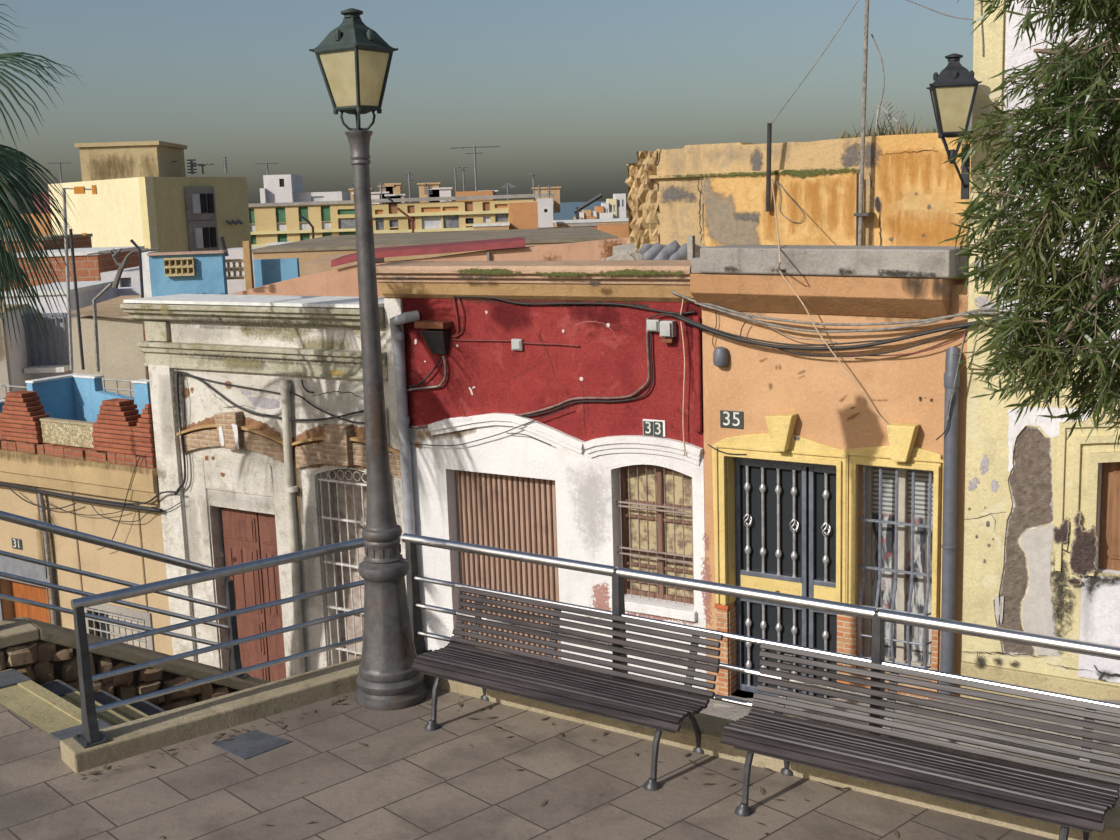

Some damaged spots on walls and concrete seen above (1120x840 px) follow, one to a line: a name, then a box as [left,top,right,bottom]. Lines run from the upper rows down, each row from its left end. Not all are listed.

water stain [841,143,881,167]
spalling [182,381,329,457]
spalling [968,406,1098,656]
crack [961,651,1120,681]